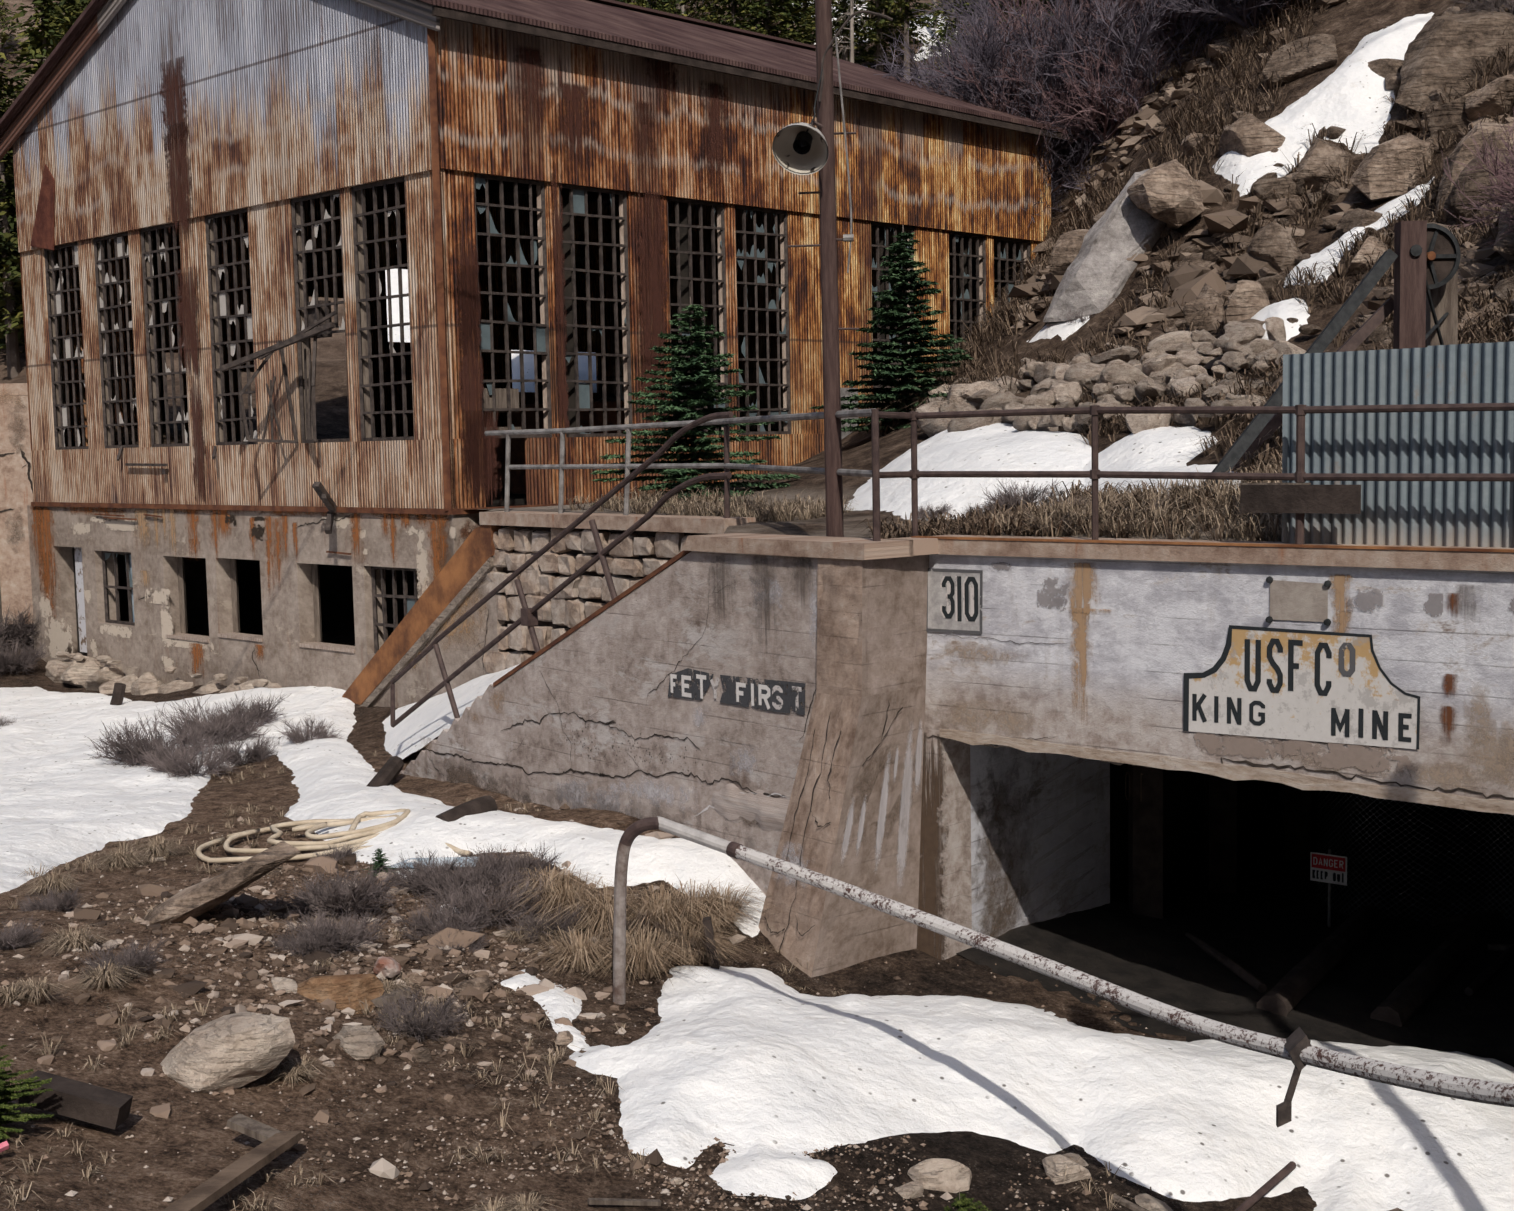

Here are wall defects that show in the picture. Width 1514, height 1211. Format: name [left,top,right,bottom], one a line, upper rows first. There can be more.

corrosion [160,56,193,236]
corrosion [516,48,597,428]
corrosion [456,238,502,506]
corrosion [31,267,327,619]
peeling [39,592,135,659]
peeling [145,587,215,672]
spalling [225,514,266,541]
spalling [322,517,368,555]
peeling [406,526,430,598]
corrosion [1070,563,1110,703]
crack [424,579,1514,954]
corrosion [1440,674,1457,737]